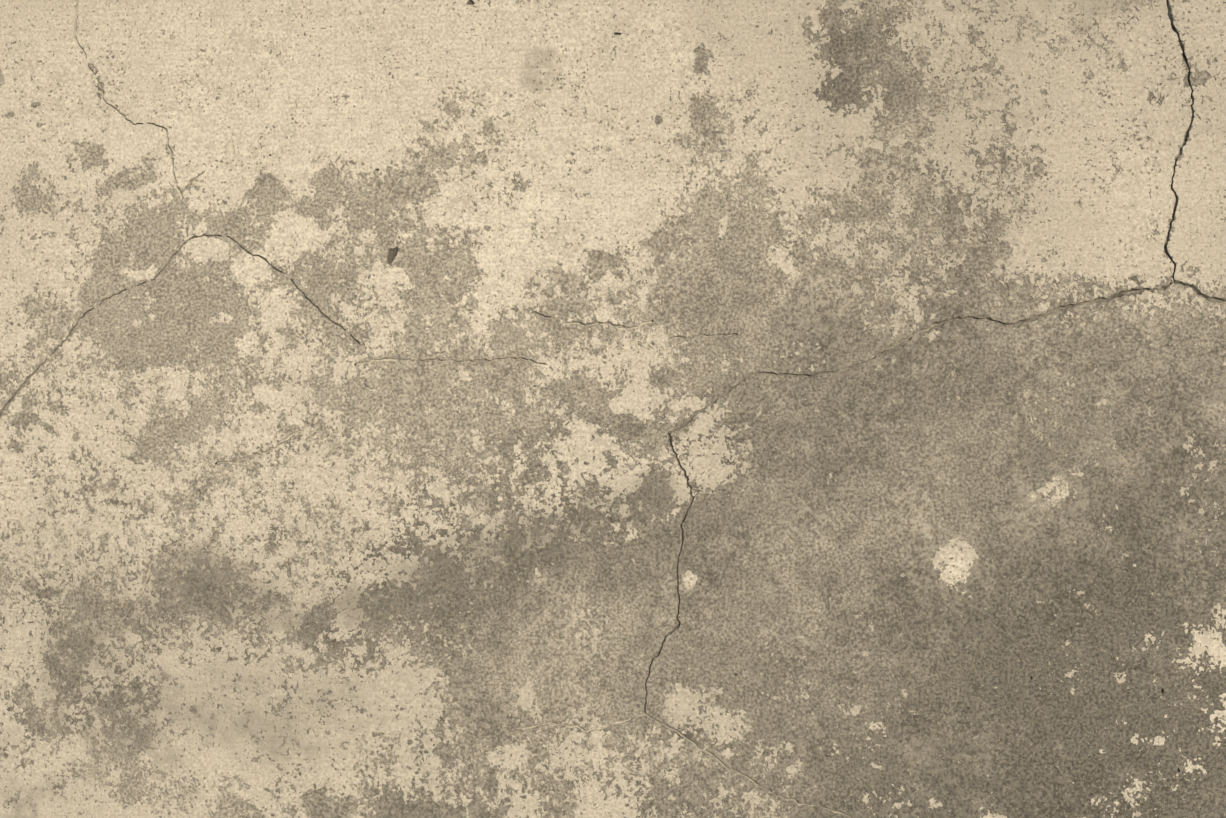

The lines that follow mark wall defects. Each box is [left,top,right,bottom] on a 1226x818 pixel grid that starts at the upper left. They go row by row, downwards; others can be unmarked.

crack [217,414,318,464]
crack [0,0,547,418]
crack [502,0,1226,818]